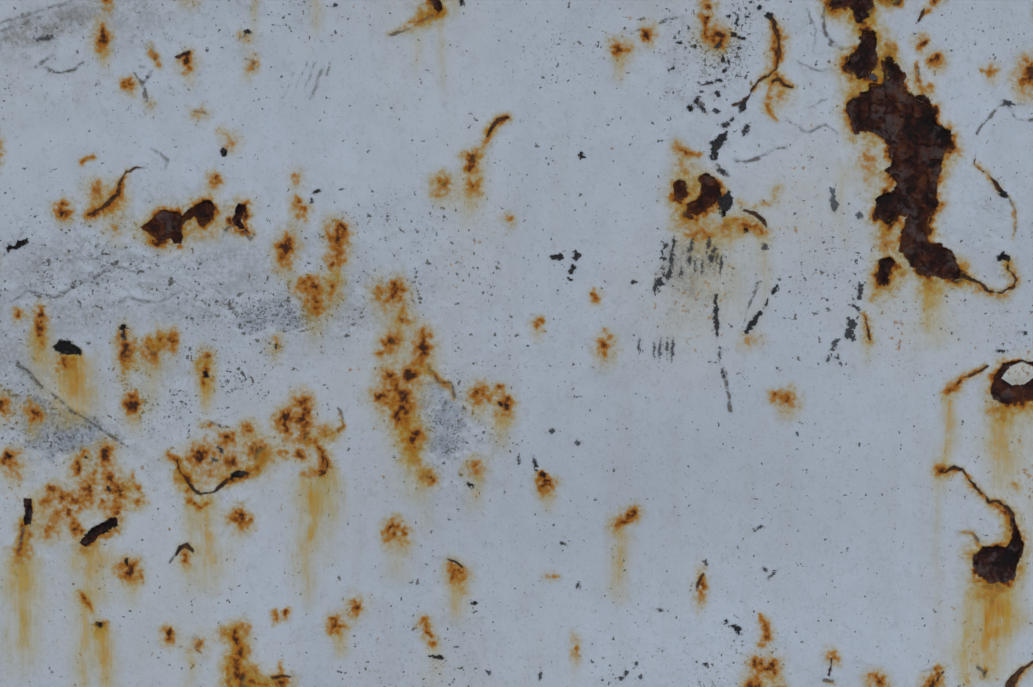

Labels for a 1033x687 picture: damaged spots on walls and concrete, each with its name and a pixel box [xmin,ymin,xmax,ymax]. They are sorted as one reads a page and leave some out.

corrosion [389,0,447,36]
corrosion [140,173,255,250]
corrosion [460,114,511,198]
corrosion [668,140,779,250]
corrosion [820,0,1020,343]
corrosion [370,278,516,489]
corrosion [942,358,1033,459]
corrosion [12,440,145,589]
corrosion [166,392,346,568]
corrosion [933,451,1027,677]
corrosion [220,622,291,687]
crack [1005,661,1033,687]